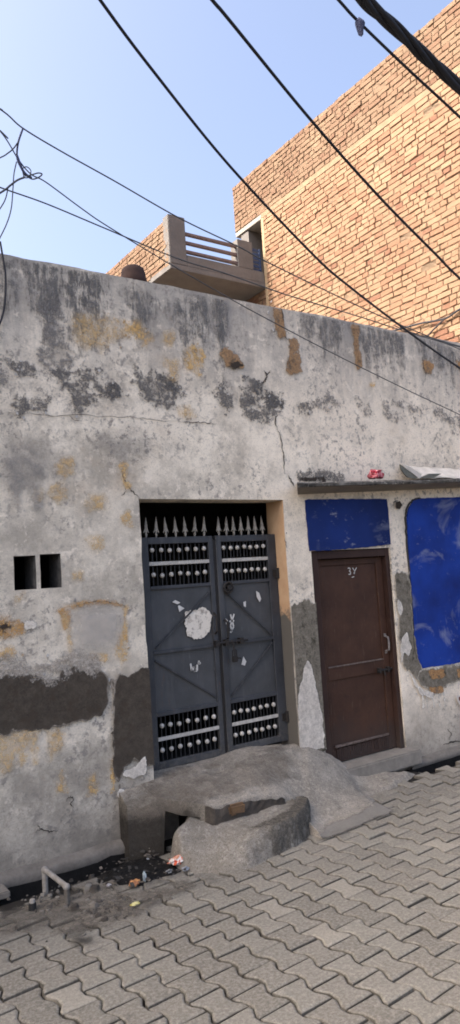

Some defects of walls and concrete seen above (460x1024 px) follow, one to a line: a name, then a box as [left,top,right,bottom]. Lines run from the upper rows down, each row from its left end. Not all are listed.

leakage [0,261,228,420]
spalling [215,347,244,375]
spalling [267,300,303,375]
spalling [351,323,365,370]
leakage [212,375,338,424]
crack [275,415,294,486]
peeling [291,594,327,752]
peeling [395,571,460,705]
peeling [0,649,154,797]